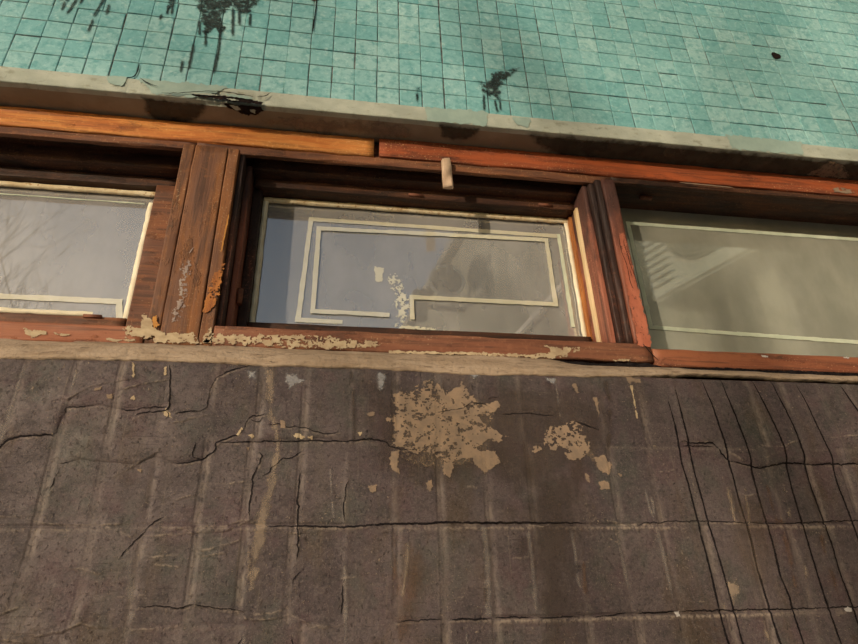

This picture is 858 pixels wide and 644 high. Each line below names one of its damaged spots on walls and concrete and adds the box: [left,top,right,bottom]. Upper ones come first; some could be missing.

water stain [213,8,251,72]
water stain [144,98,205,123]
peeling [139,78,271,116]
water stain [440,125,479,139]
water stain [531,135,858,181]
peeling [106,247,580,359]
crack [123,361,271,417]
peeling [386,379,509,478]
peeling [532,421,622,490]
crack [176,413,584,584]
crack [561,344,858,644]
crack [398,615,575,623]